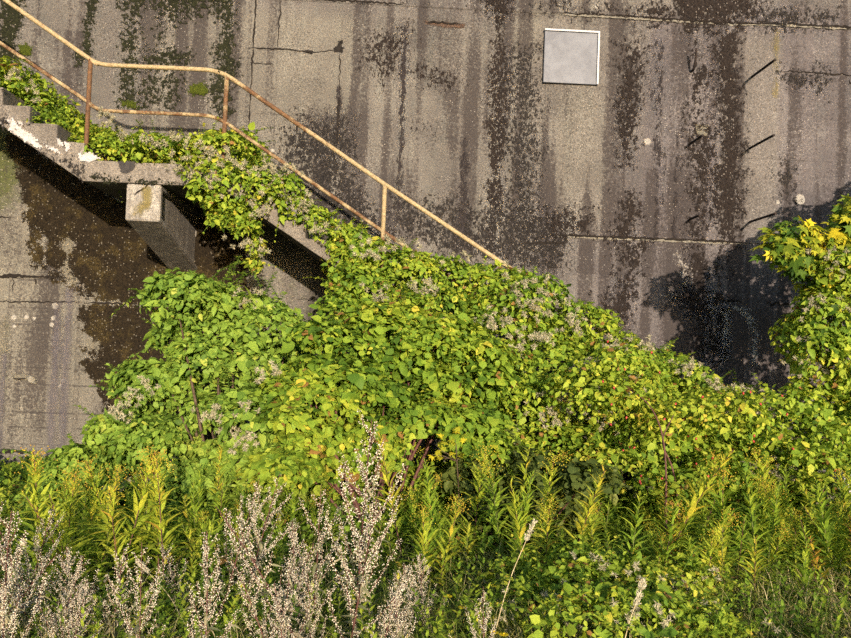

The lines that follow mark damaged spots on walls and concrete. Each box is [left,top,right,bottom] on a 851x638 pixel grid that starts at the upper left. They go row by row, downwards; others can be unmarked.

crack [328,0,405,8]
crack [247,0,341,147]
leakage [36,147,86,183]
leakage [135,187,151,214]
leakage [269,0,843,373]
crack [0,273,144,305]